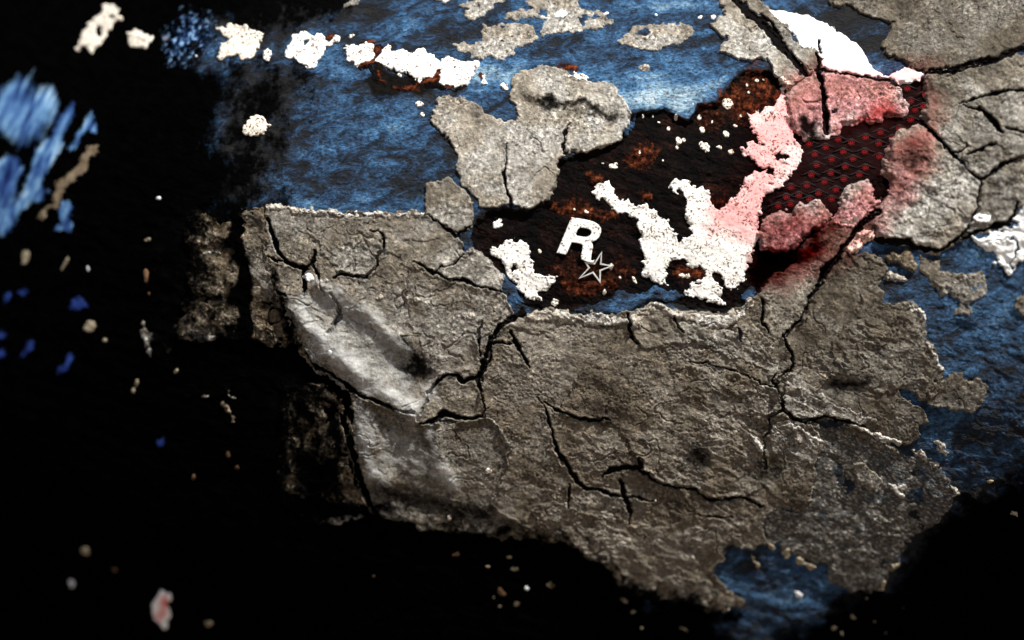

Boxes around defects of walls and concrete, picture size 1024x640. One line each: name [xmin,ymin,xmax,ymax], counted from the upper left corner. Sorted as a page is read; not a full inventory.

peeling [75,4,272,64]
peeling [285,31,508,117]
crack [924,45,1024,75]
peeling [242,115,271,136]
crack [266,217,385,335]
crack [307,213,530,425]
crack [626,312,639,344]
spalling [471,60,803,329]
crack [691,88,1024,463]
spalling [845,210,878,254]
spalling [886,248,918,273]
crack [537,397,764,525]